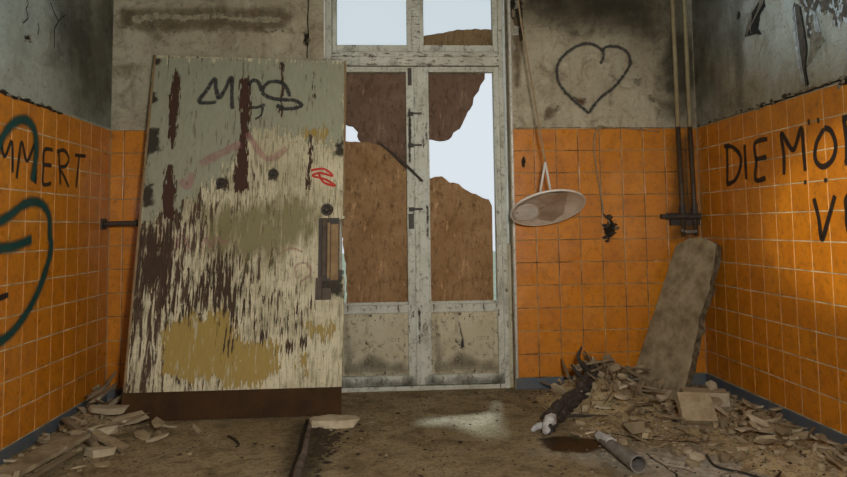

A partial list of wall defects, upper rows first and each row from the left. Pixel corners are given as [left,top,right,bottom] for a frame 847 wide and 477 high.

crack [23,0,65,48]
damp [665,36,692,112]
flaking render [537,0,847,129]
flaking render [0,89,63,115]
crack [596,431,692,477]